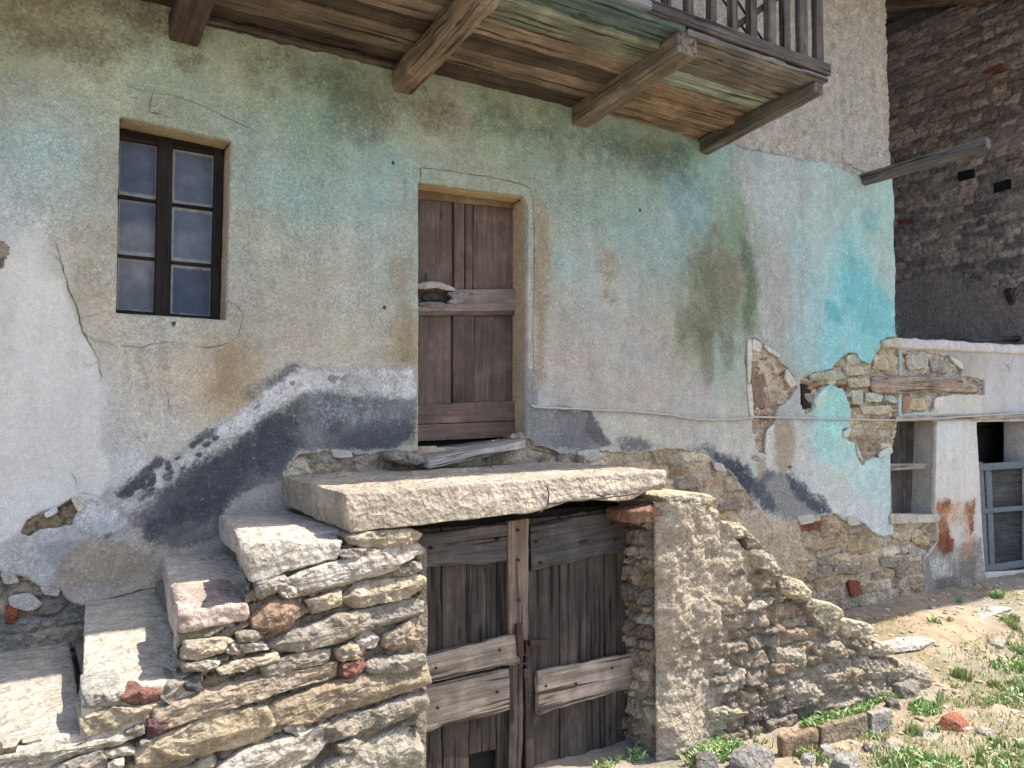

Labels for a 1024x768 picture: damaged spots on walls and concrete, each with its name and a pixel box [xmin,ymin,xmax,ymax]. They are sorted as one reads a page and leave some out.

crack [51,242,243,376]
water stain [681,162,770,374]
peeling [21,365,417,560]
water stain [245,365,299,398]
spalling [285,446,454,475]
spalling [443,432,986,611]
water stain [758,421,795,473]
spalling [744,335,983,465]
rust [936,499,975,555]
spalling [0,572,85,659]